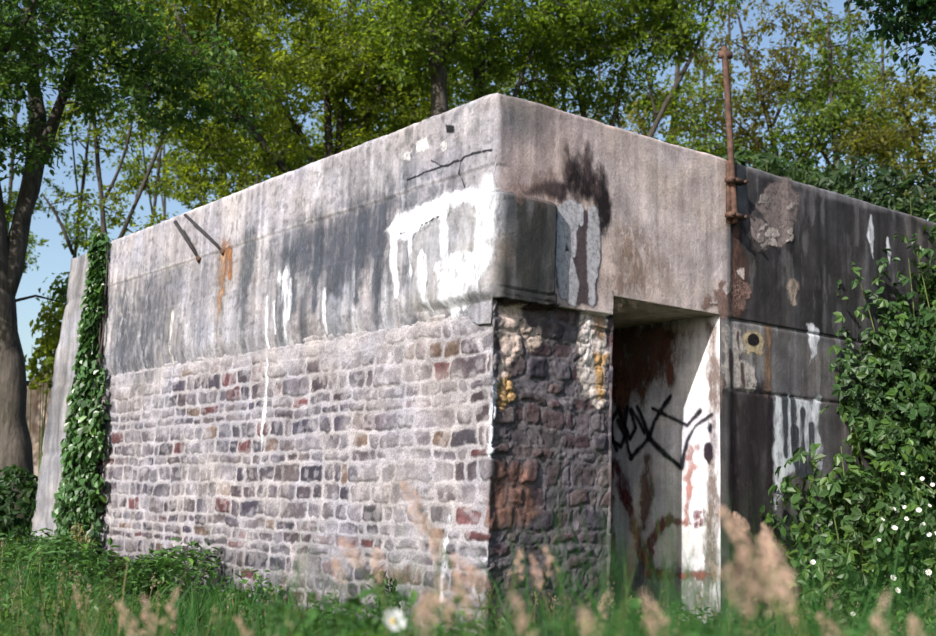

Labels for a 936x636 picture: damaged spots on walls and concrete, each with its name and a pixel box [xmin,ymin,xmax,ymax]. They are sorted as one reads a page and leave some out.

crack [407,149,492,188]
water stain [514,144,612,234]
spalling [748,177,800,252]
corrosion [218,242,232,312]
water stain [242,229,255,292]
water stain [260,174,496,447]
peeling [495,199,611,409]
water stain [789,279,798,306]